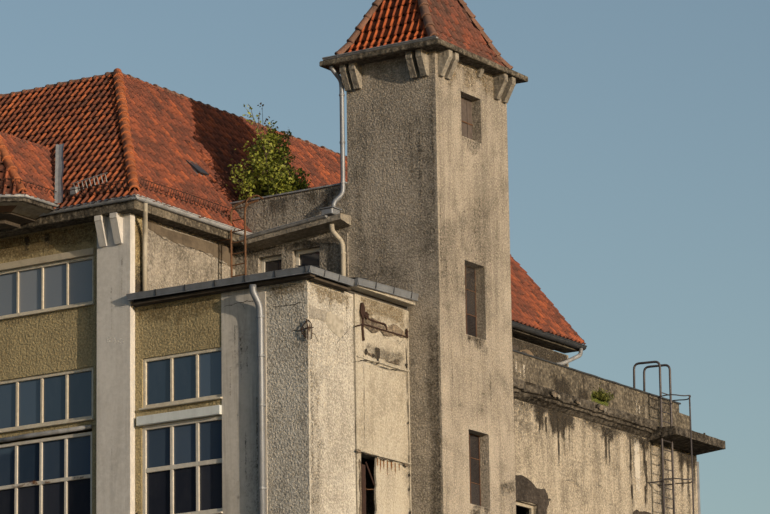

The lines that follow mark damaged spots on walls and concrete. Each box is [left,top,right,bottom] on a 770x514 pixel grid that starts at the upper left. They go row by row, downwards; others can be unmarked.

water stain [513,397,575,462]
corrosion [361,462,375,514]
spalling [356,449,409,475]
water stain [585,419,669,506]
water stain [678,450,697,502]